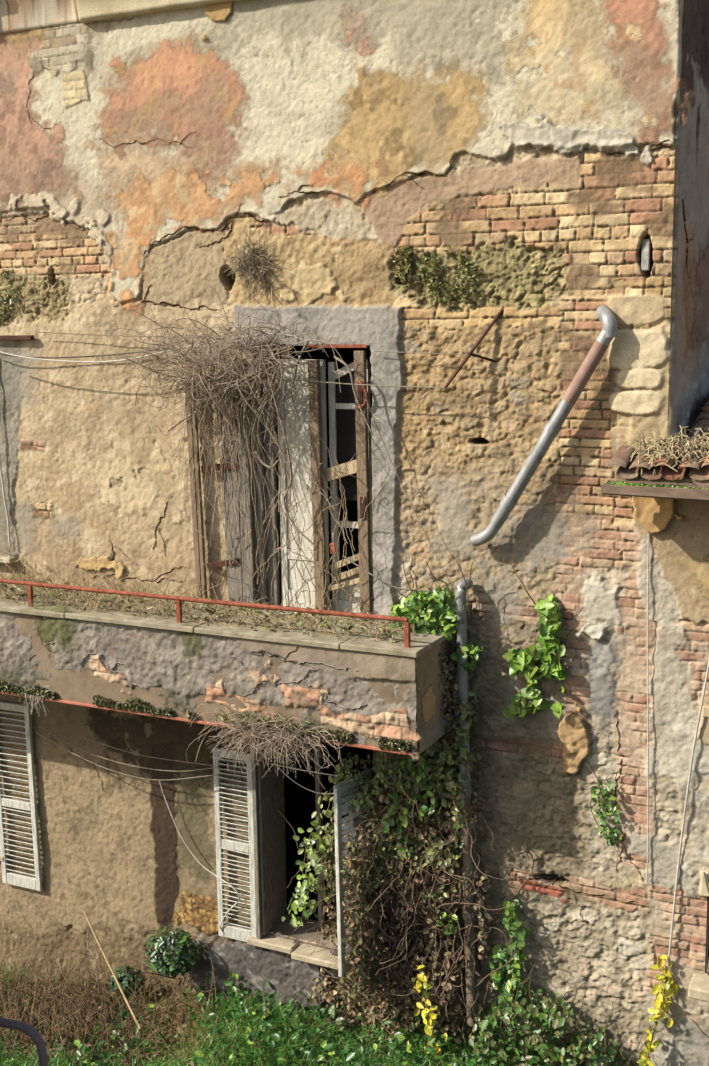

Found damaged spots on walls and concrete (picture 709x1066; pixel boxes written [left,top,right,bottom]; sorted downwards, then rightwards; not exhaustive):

leakage [677,0,709,123]
peeling [296,0,686,208]
peeling [0,15,280,315]
crack [142,203,267,256]
crack [278,184,322,197]
crack [359,155,454,200]
crack [117,284,218,311]
flaking render [280,260,348,307]
crack [75,501,181,583]
flaking render [575,622,610,640]
spalling [205,660,420,760]
leakage [89,707,251,924]